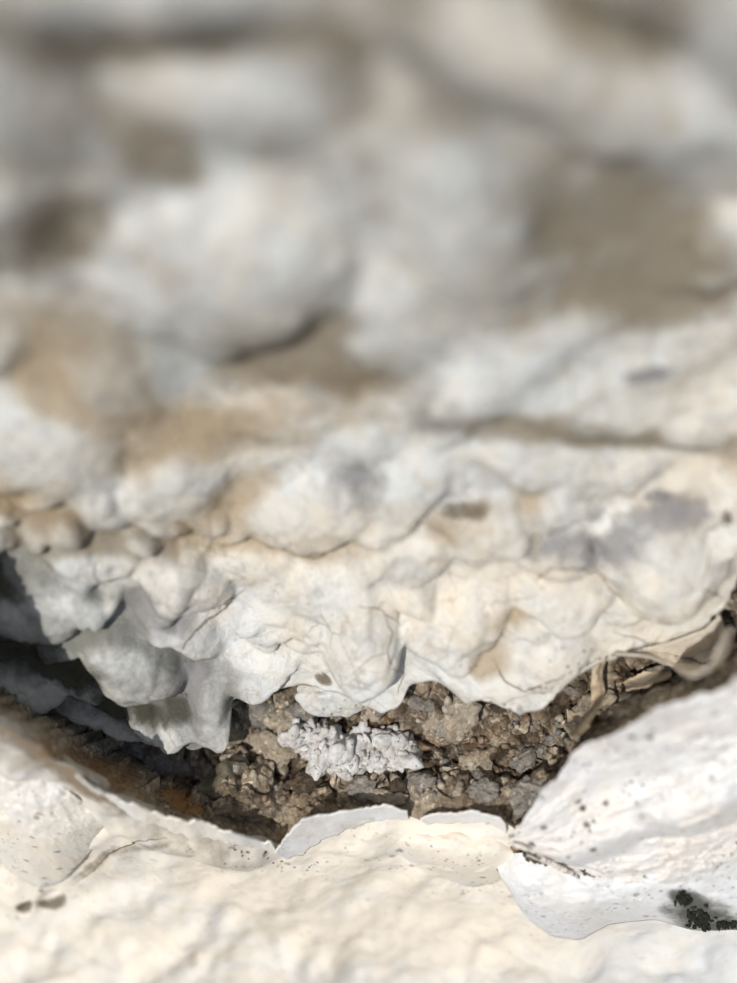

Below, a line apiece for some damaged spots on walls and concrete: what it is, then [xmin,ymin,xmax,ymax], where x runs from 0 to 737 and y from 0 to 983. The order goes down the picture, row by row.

crack [535,534,629,606]
crack [494,658,598,692]
crack [613,632,670,649]
spalling [0,581,737,901]